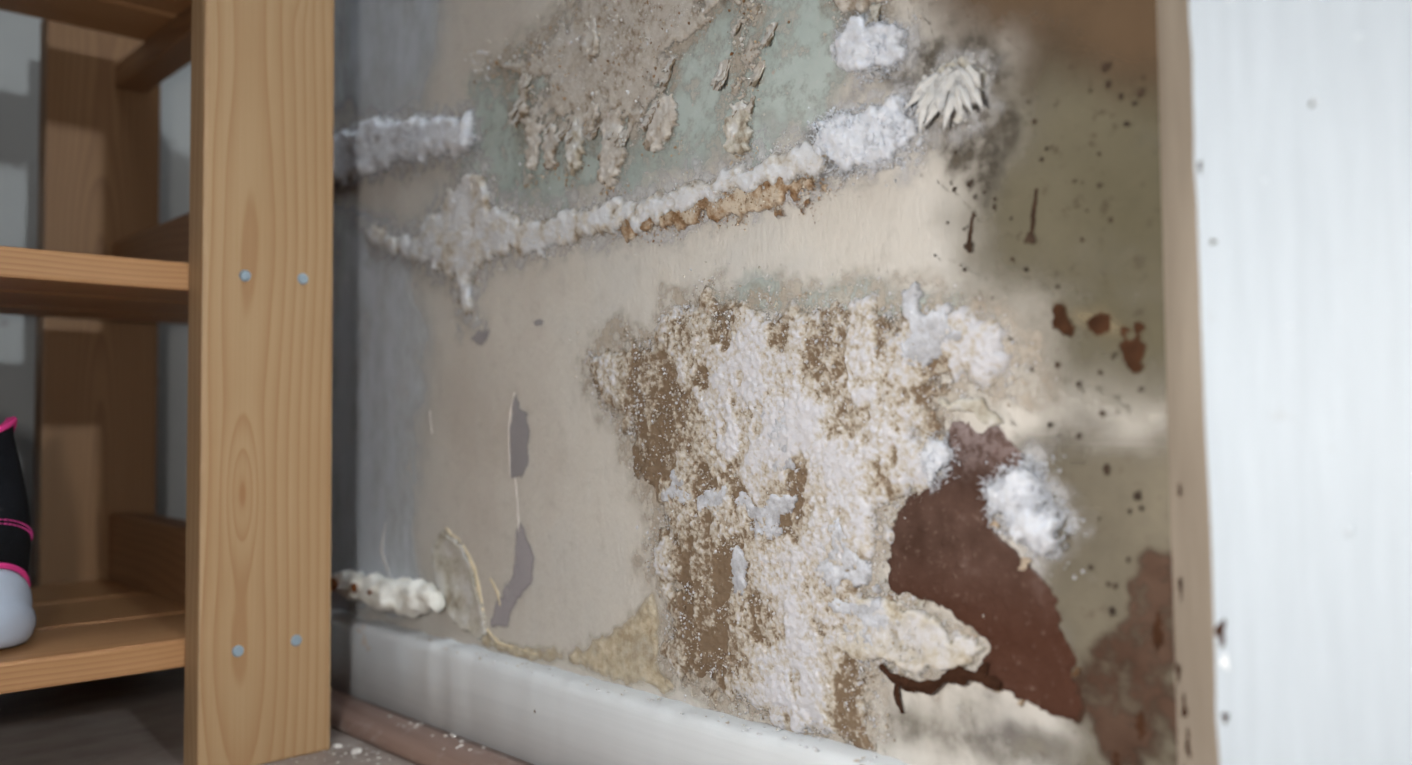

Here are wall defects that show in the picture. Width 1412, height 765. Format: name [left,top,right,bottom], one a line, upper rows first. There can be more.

flaking render [458,0,790,196]
flaking render [823,0,923,39]
water stain [331,0,1177,765]
flaking render [829,397,1085,724]